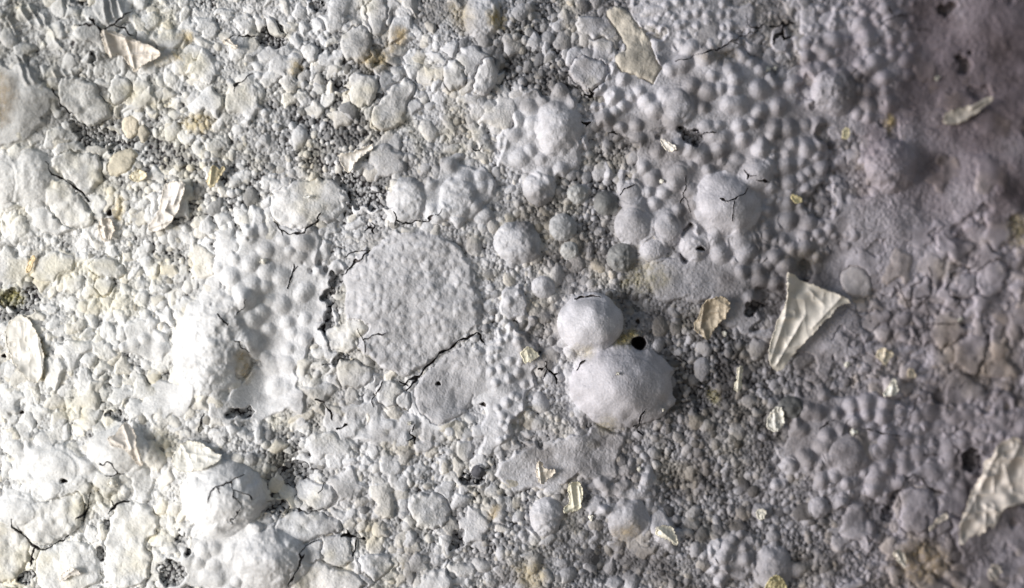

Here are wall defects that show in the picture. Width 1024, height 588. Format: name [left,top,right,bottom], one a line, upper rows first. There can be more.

peeling [89,29,161,72]
crack [371,332,485,407]
peeling [744,272,850,371]
peeling [959,437,1024,545]